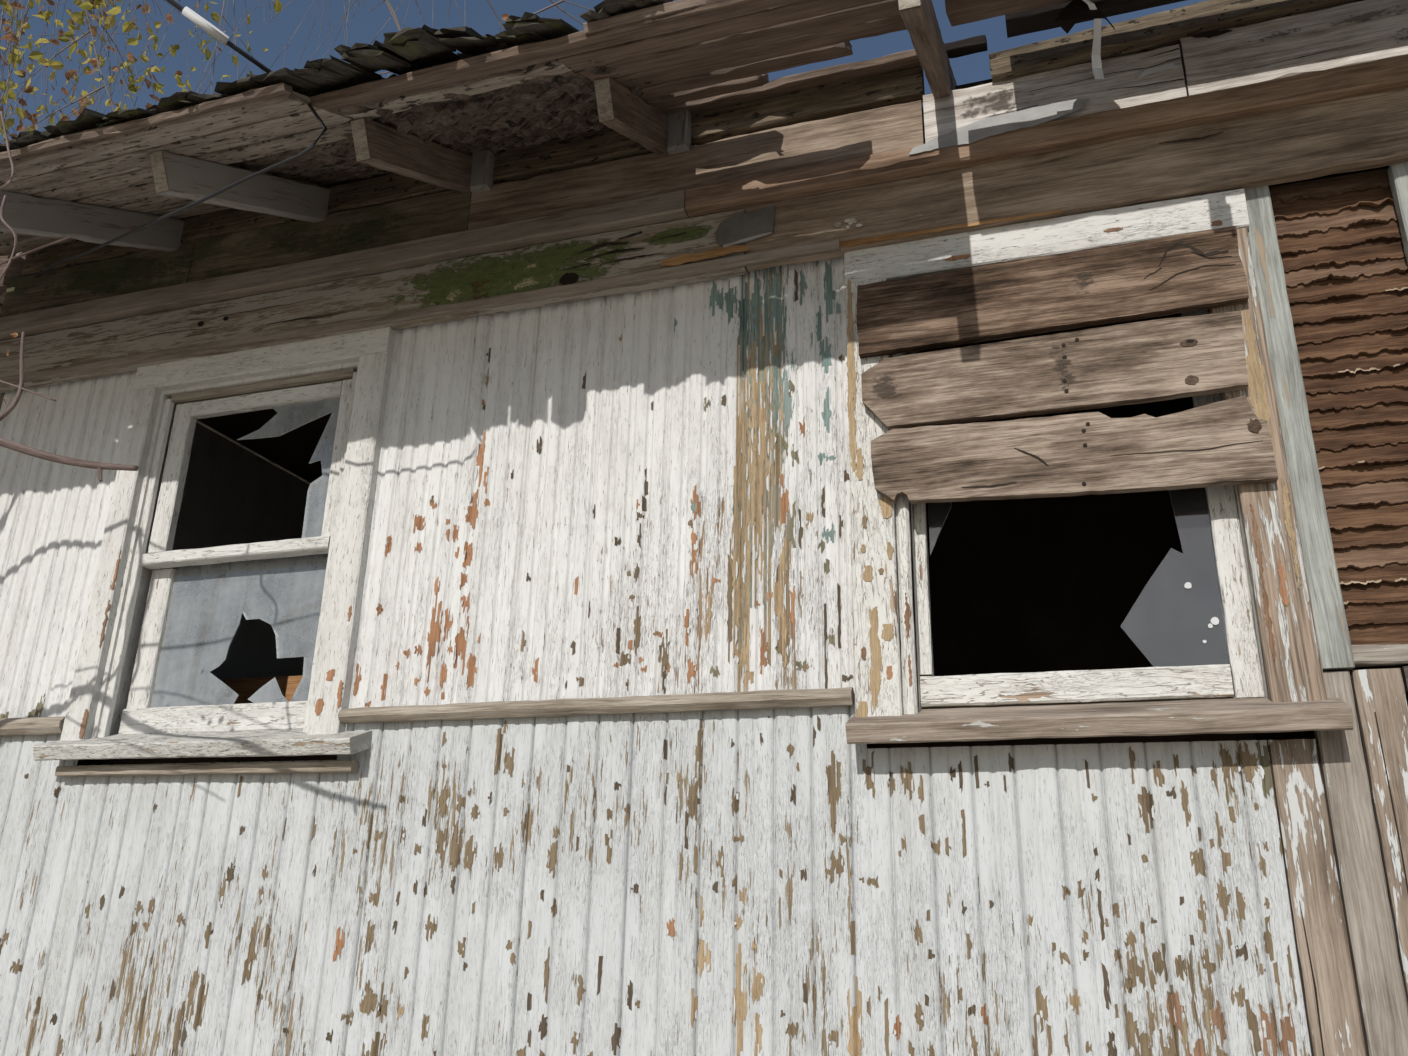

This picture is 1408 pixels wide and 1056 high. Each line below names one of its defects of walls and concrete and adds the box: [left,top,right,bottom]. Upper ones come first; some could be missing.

crack [1144,241,1236,290]
peeling [613,262,864,694]
peeling [315,430,490,716]
peeling [171,967,209,1056]
peeling [326,979,404,1056]
peeling [400,786,509,894]
peeling [663,719,703,880]
peeling [691,835,765,1056]
peeling [825,750,846,883]
peeling [828,976,935,1056]
peeling [862,751,1014,858]
peeling [1052,741,1297,1056]